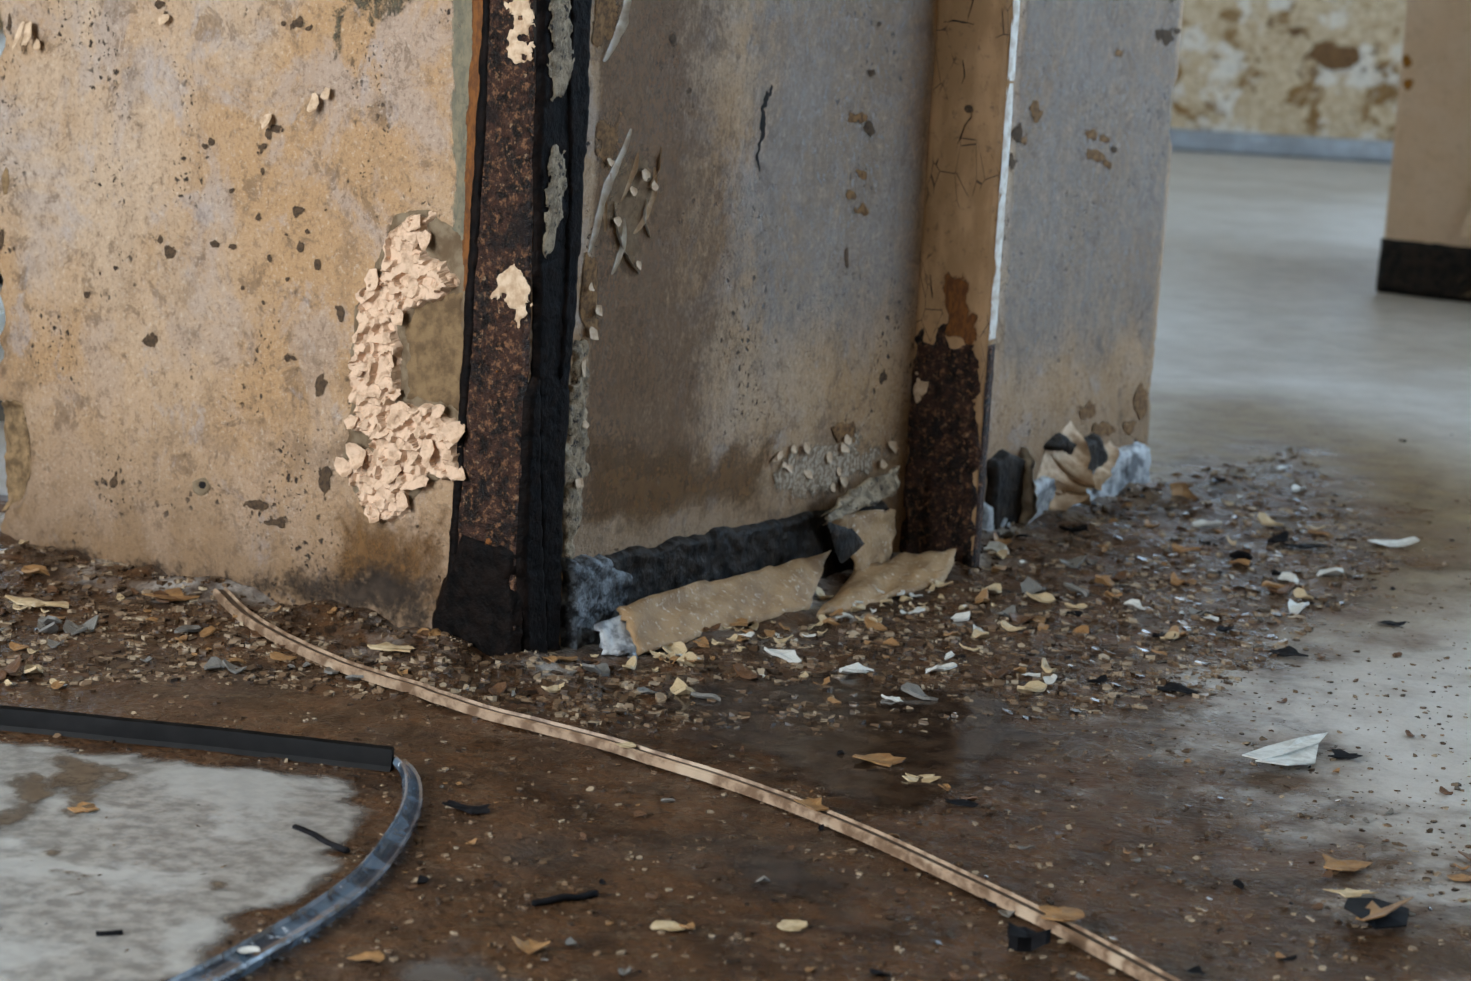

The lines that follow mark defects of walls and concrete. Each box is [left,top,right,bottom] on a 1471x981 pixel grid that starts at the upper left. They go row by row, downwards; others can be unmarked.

corrosion [462,0,483,291]
crack [755,85,773,172]
peeling [318,210,466,523]
spalling [541,110,1331,705]
corrosion [899,272,995,568]
corrosion [432,534,523,656]